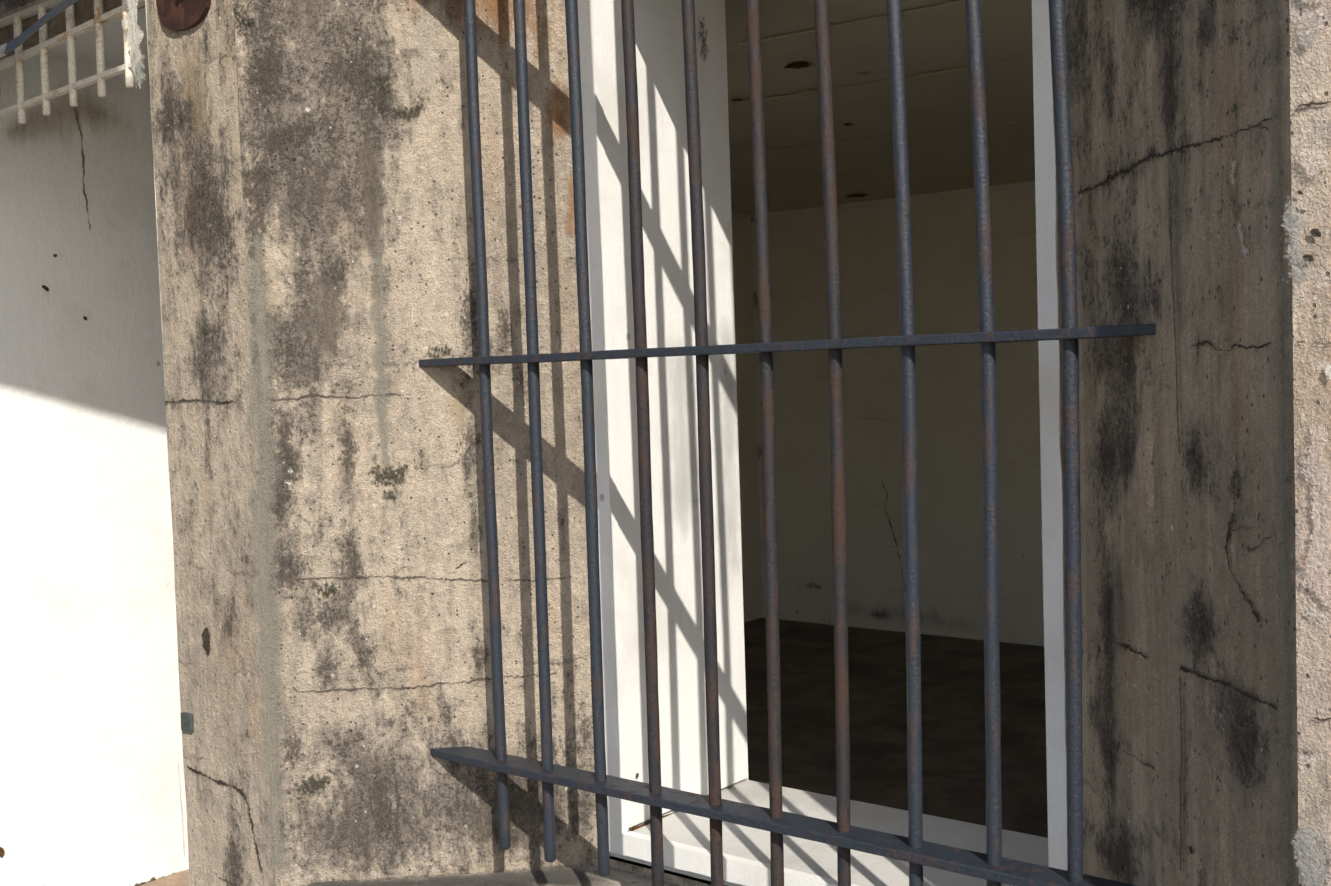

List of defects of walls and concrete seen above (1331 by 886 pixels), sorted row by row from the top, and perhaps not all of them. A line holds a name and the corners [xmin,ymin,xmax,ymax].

water stain [338,27,425,120]
crack [74,107,91,230]
crack [1078,101,1331,194]
water stain [361,145,387,467]
water stain [1169,162,1240,525]
crack [1191,340,1331,351]
water stain [179,0,376,868]
crack [1224,480,1271,628]
water stain [1088,568,1122,809]
crack [1180,665,1277,710]
crack [187,766,263,885]
water stain [222,831,247,886]